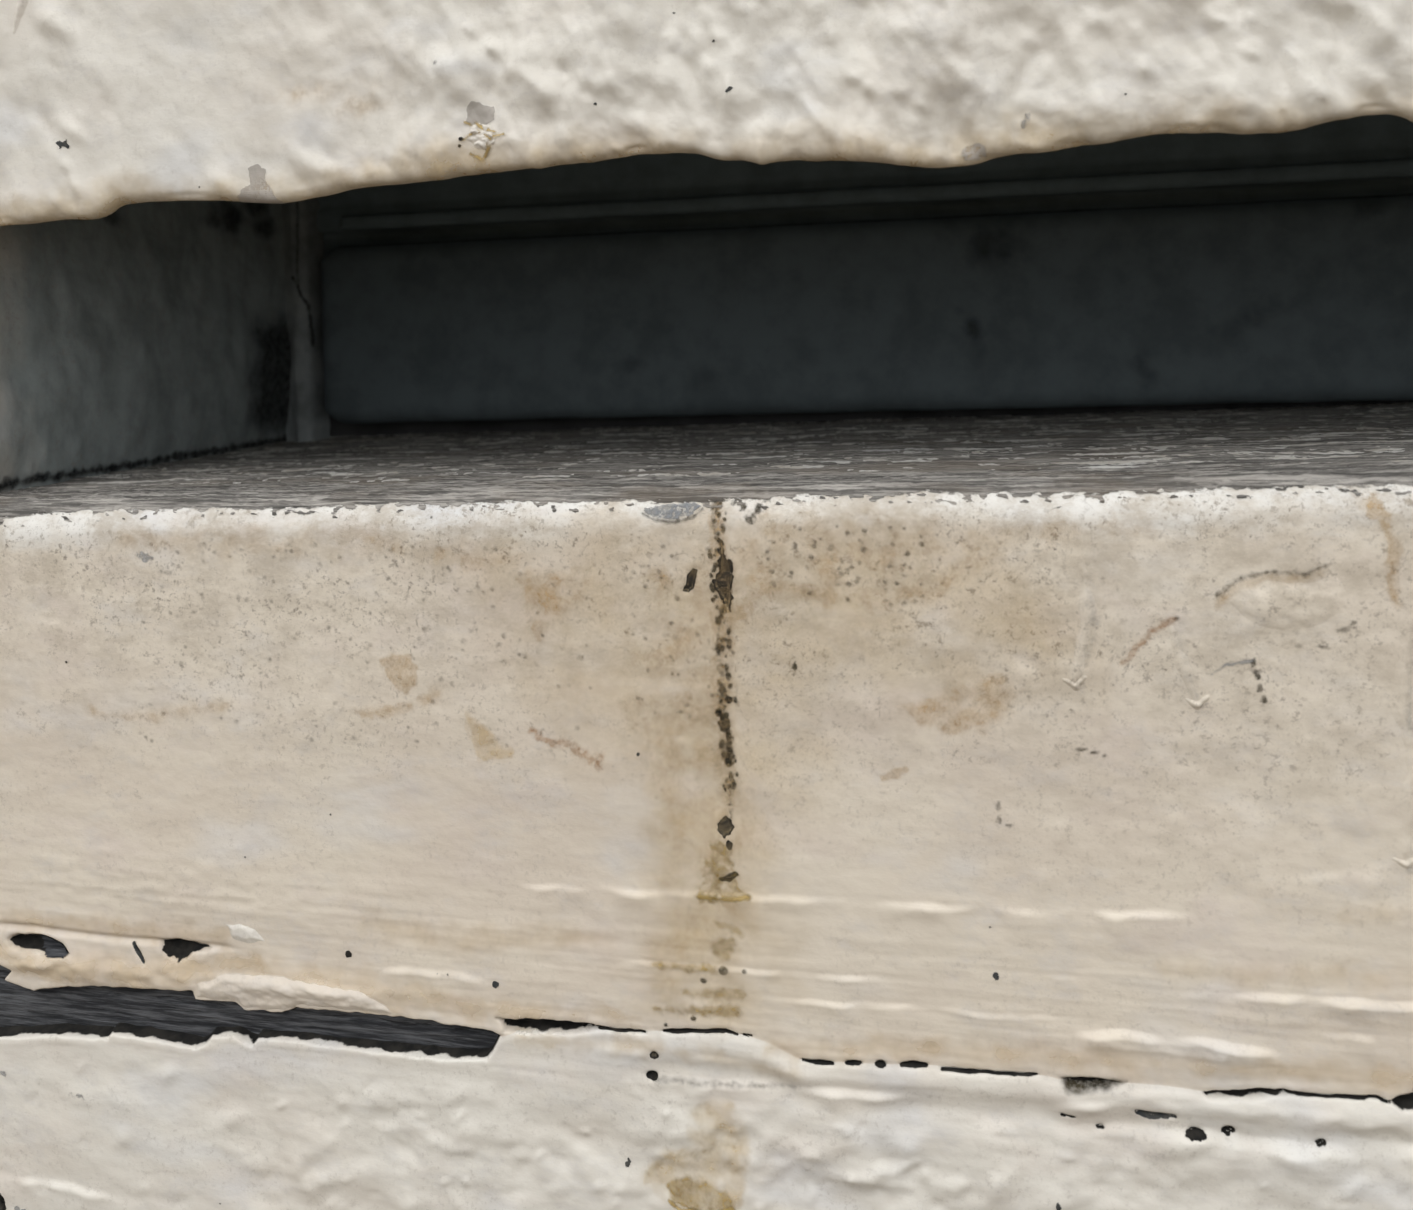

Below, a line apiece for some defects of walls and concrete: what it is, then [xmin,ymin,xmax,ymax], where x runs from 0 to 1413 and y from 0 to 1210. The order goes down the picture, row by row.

peeling [458,101,504,160]
damp [211,203,273,236]
damp [253,321,291,429]
crack [708,500,766,882]
damp [697,846,750,902]
crack [802,1058,1122,1093]
crack [1204,1088,1413,1110]
damp [667,1177,734,1210]